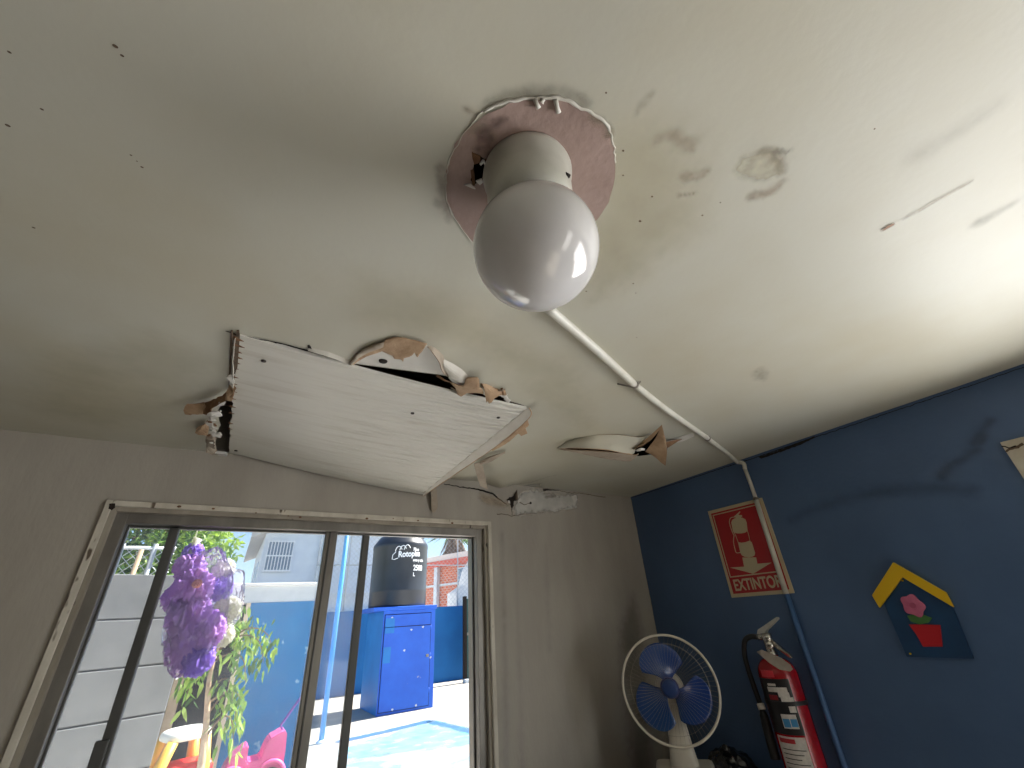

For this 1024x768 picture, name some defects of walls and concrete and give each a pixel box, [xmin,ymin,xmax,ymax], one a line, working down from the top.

flaking render [444,95,616,242]
peeling [423,408,531,496]
spalling [507,484,577,515]